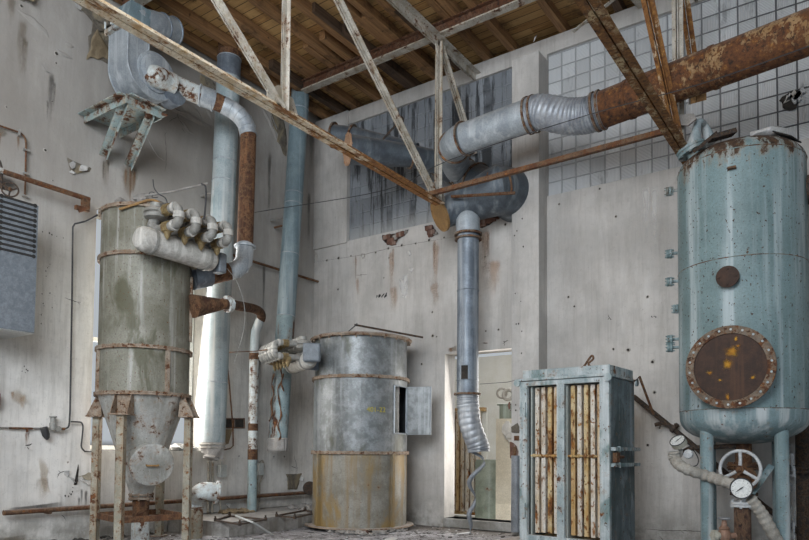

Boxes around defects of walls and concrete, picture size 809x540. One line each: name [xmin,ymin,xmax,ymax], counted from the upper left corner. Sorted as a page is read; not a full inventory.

spalling [382,229,409,259]
spalling [424,225,445,242]